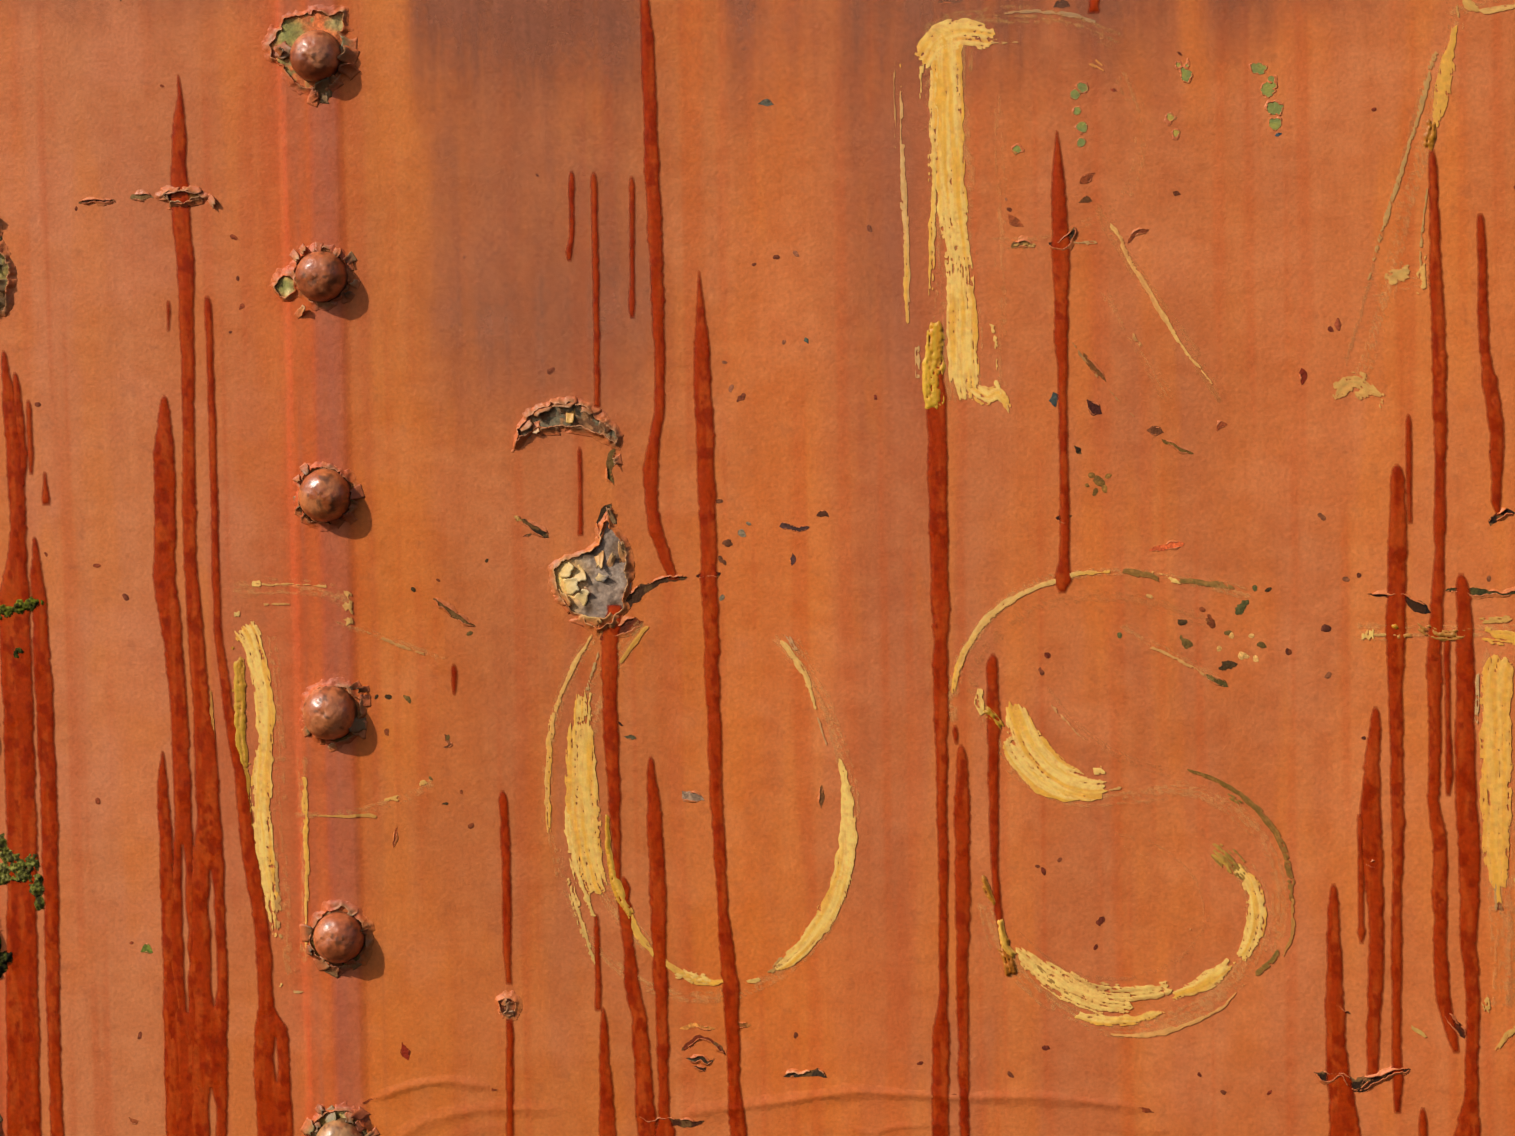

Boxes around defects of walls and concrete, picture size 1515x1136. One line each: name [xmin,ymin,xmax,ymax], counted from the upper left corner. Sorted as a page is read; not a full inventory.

peeling [0,223,17,317]
rust [0,352,64,1136]
rust [152,76,293,1136]
peeling [511,396,624,485]
peeling [548,503,635,636]
rust [601,605,675,1136]
rust [628,0,678,579]
rust [694,274,747,1136]
rust [926,366,971,1136]
rust [1051,132,1071,592]
rust [1325,415,1412,1136]
rust [1426,151,1481,1136]